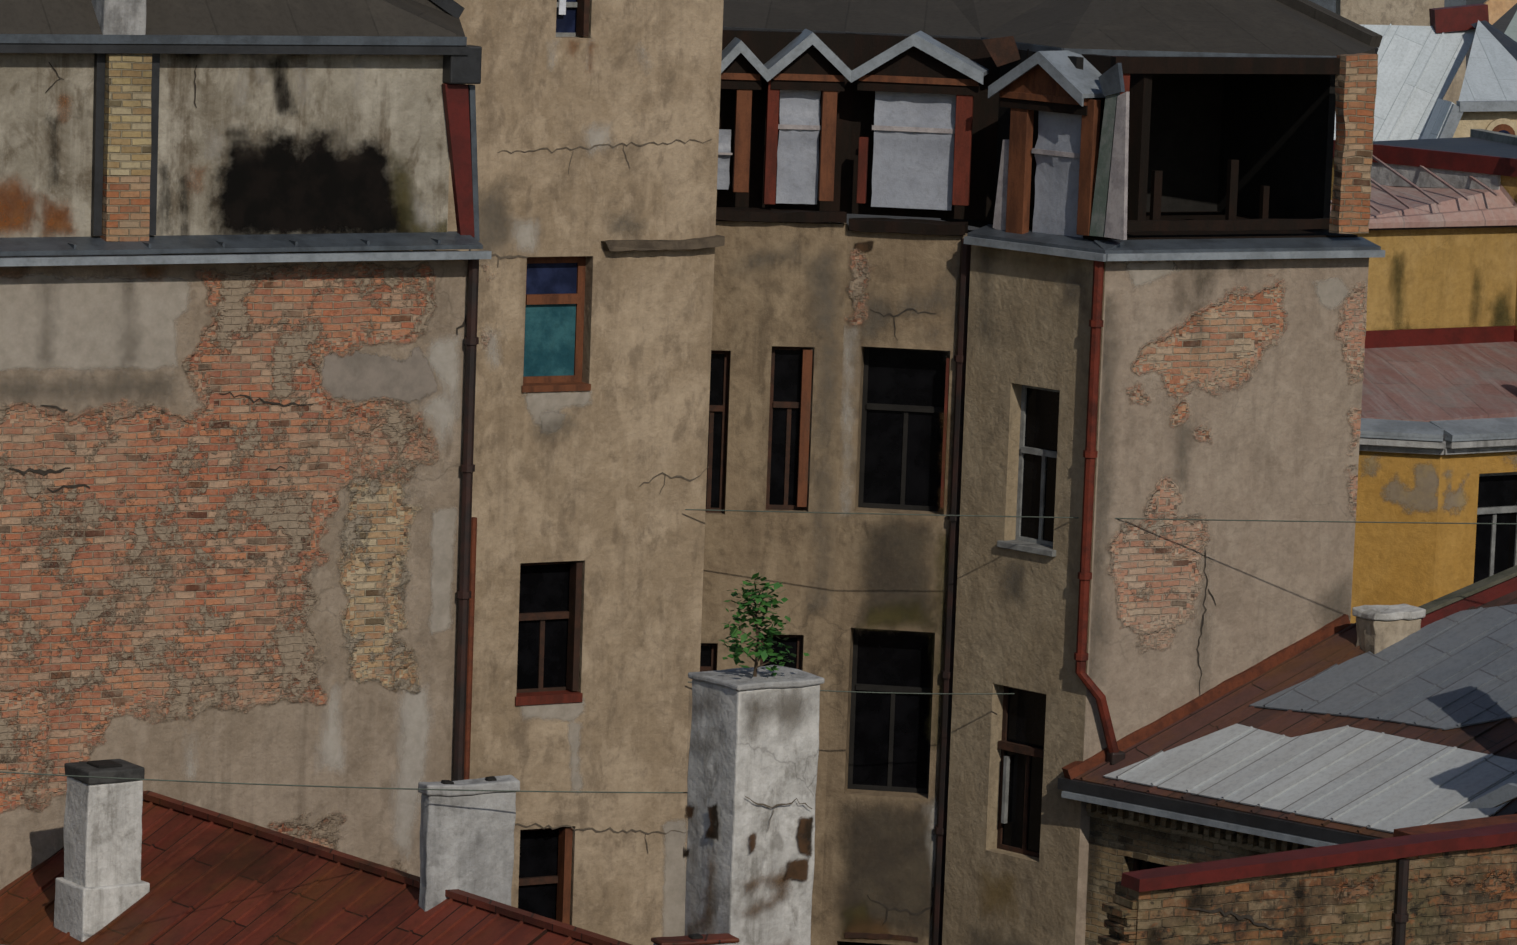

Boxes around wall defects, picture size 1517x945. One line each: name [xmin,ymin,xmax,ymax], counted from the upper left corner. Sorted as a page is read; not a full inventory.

crack [498,139,712,174]
spalling [1127,280,1288,443]
spalling [0,261,458,813]
crack [640,467,708,494]
spalling [1107,476,1210,654]